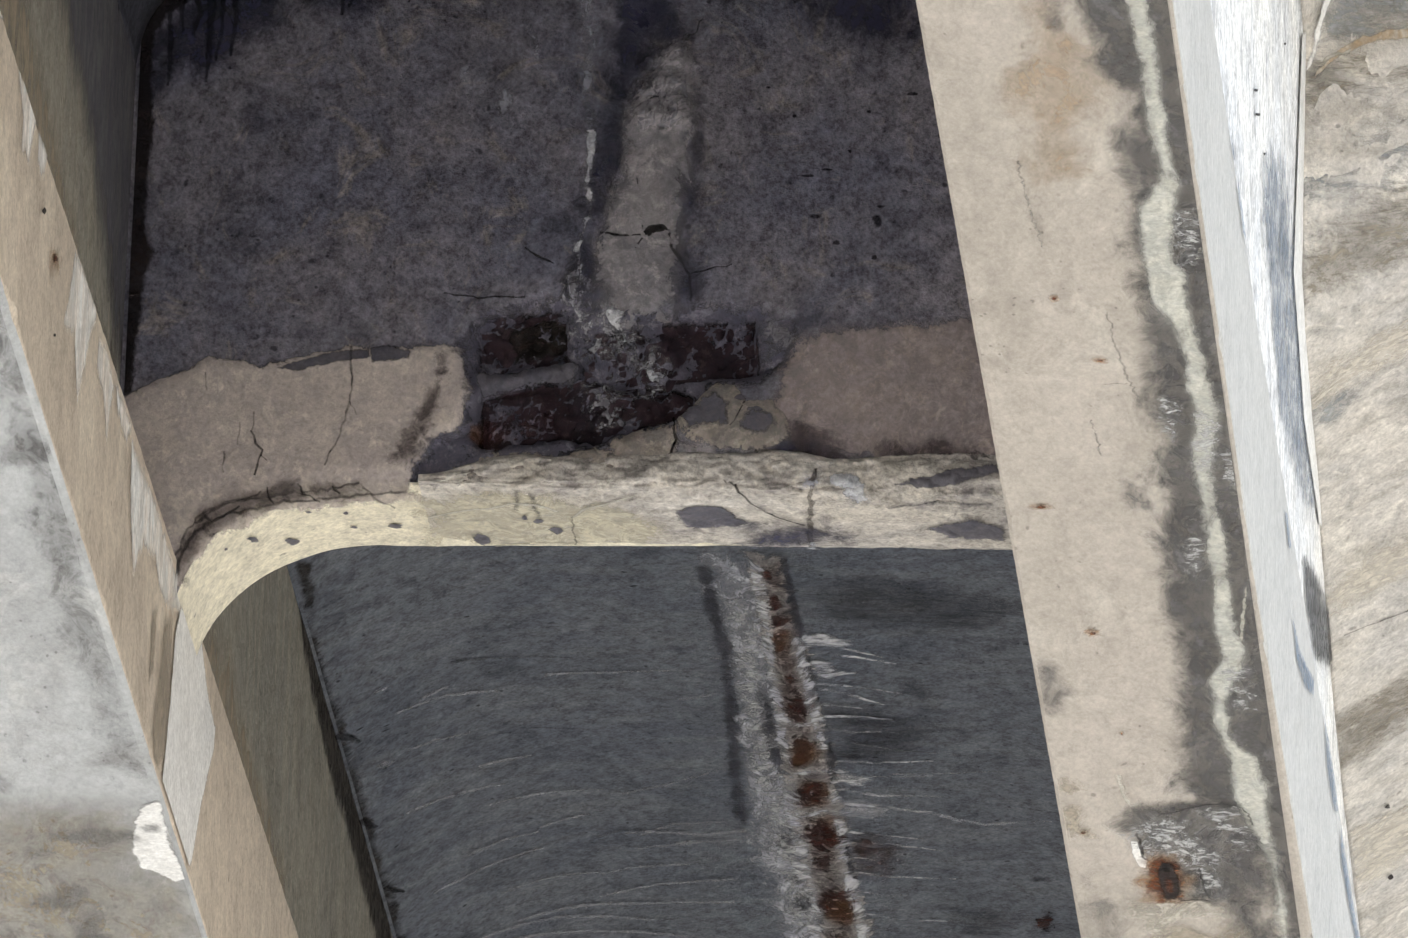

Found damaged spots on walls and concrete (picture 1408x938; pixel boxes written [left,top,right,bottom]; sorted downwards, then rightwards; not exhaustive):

leakage [0,0,286,938]
crack [175,346,418,576]
peeling [124,36,996,587]
crack [670,417,678,453]
crack [724,468,819,550]
leakage [747,523,848,548]
leakage [885,439,999,507]
leakage [929,504,1005,541]
leakage [1078,0,1300,938]
leakage [297,563,405,938]
leakage [698,552,817,938]
spalling [744,552,874,938]